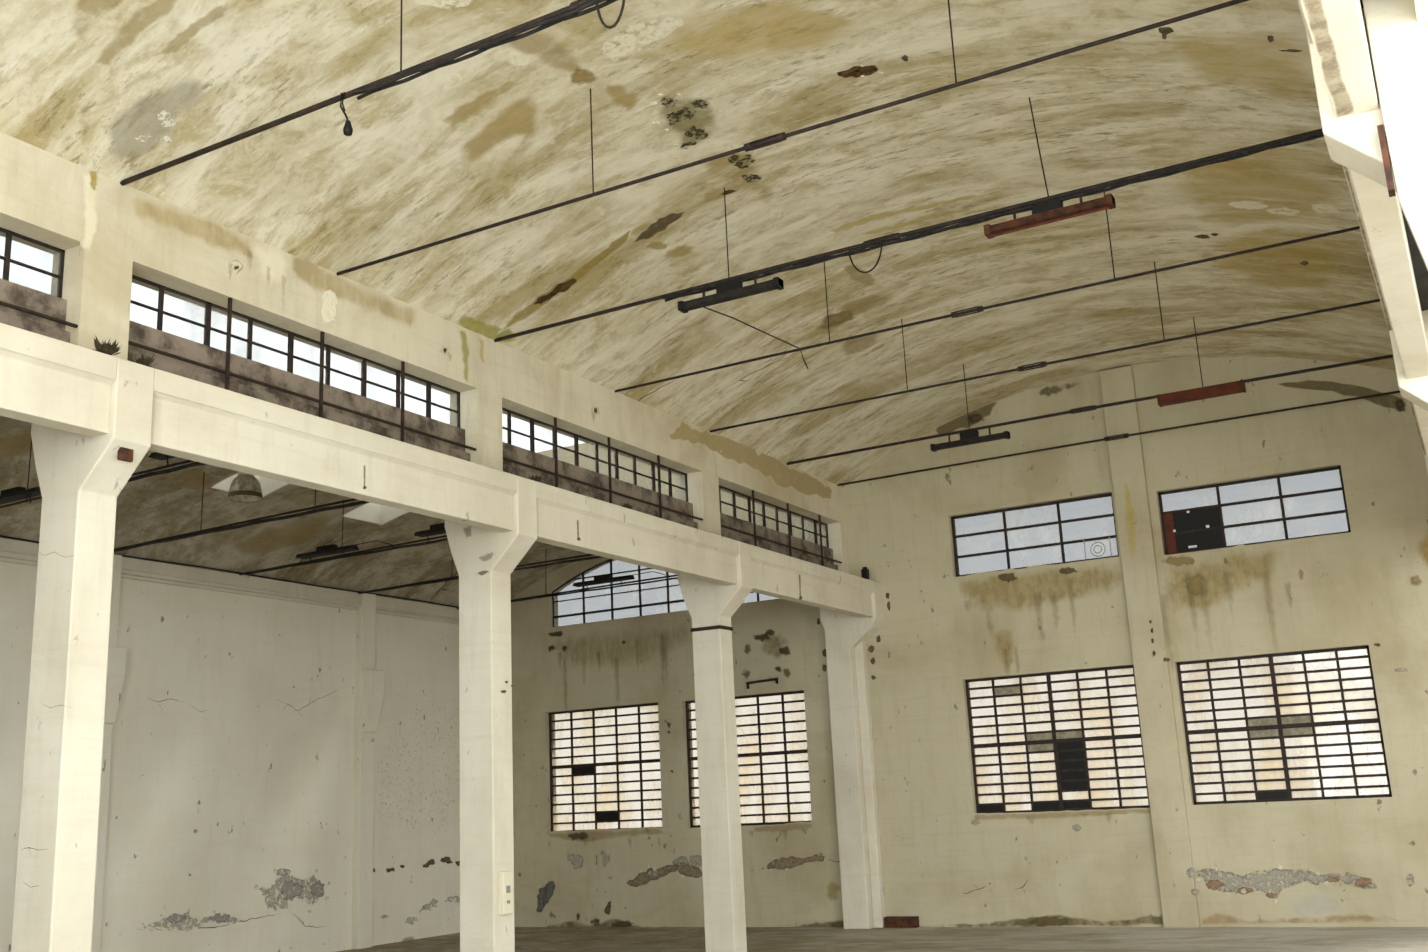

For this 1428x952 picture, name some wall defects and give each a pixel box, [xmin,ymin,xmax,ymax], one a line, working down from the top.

damp [413,0,477,12]
damp [436,0,868,385]
damp [956,481,1139,672]
damp [1159,543,1304,619]
peeling [249,868,331,917]
spalling [536,880,556,914]
spalling [624,855,702,888]
spalling [755,853,829,872]
spalling [1186,864,1380,903]
peeling [137,908,241,933]